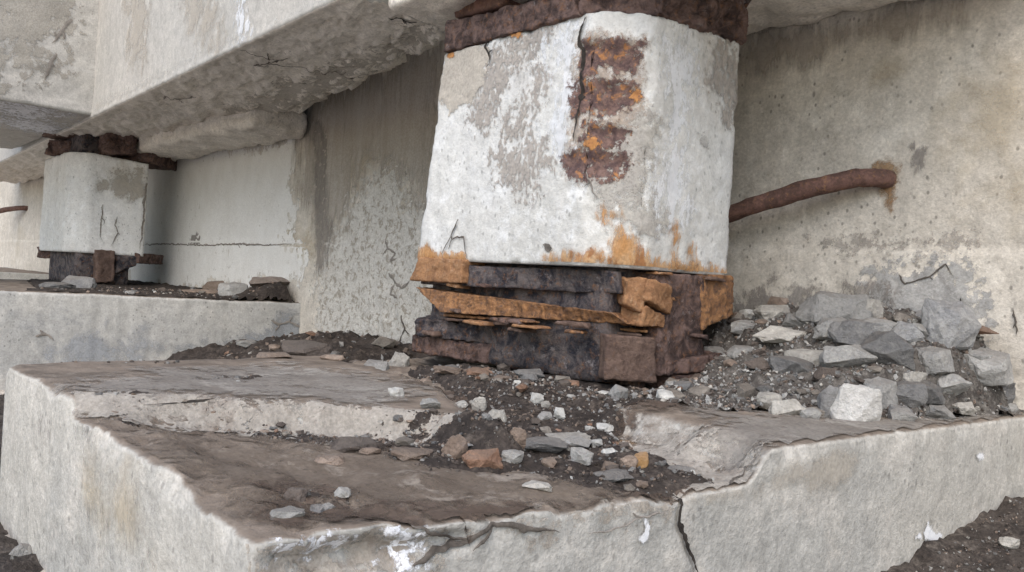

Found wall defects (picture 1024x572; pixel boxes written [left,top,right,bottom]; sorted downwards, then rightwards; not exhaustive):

peeling [438,25,557,206]
crack [573,17,586,140]
corrosion [558,34,647,184]
crack [100,183,292,253]
corrosion [542,205,727,282]
corrosion [872,161,902,212]
corrosion [449,308,592,334]
spalling [71,390,455,446]
spalling [298,502,335,515]
spalling [246,524,449,572]
crack [406,521,560,567]
crack [590,490,698,572]